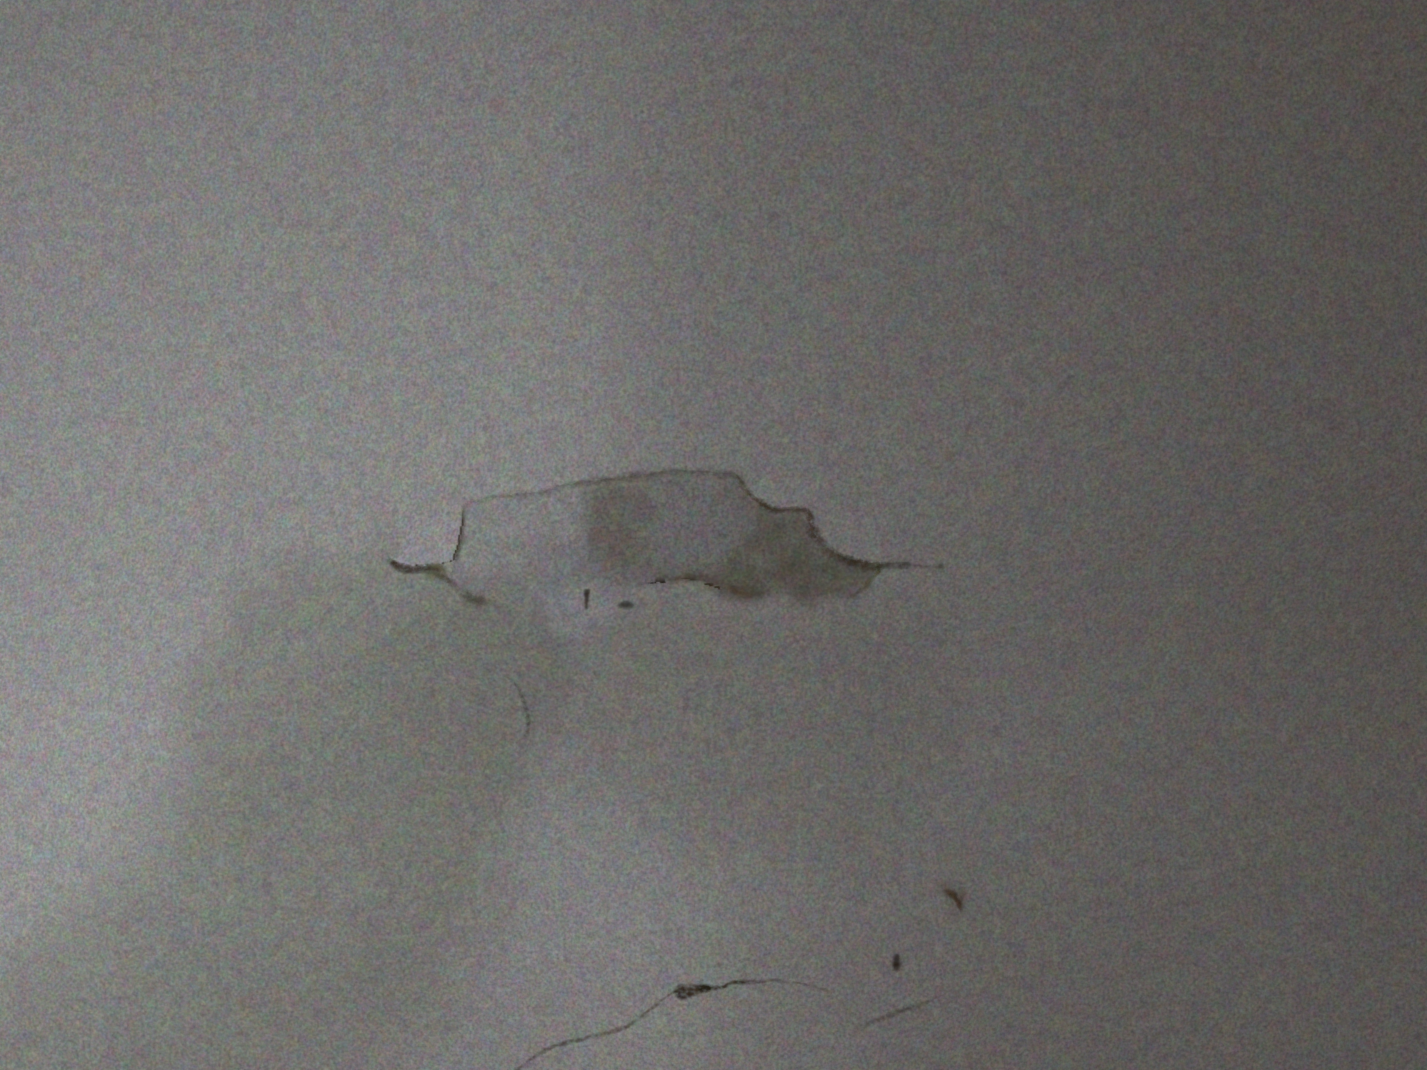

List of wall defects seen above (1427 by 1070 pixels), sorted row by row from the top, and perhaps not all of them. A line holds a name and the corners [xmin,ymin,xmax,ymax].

peeling [390,470,908,607]
crack [625,981,745,1028]